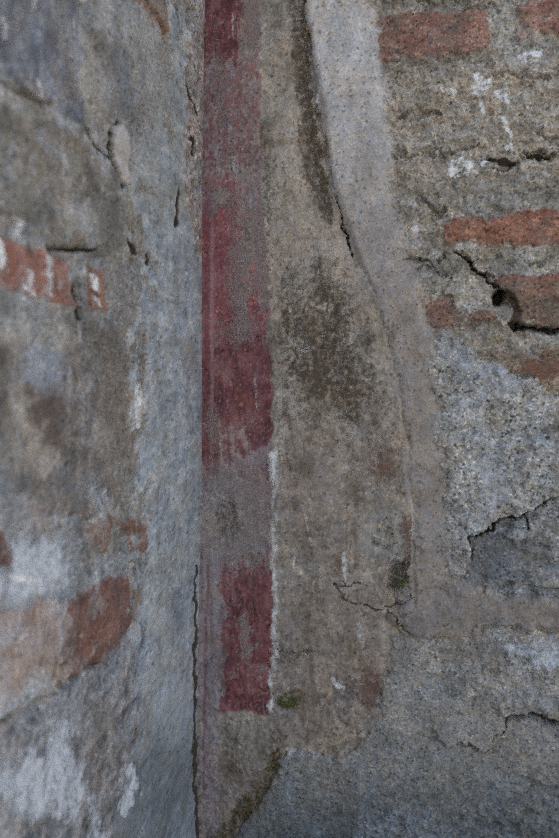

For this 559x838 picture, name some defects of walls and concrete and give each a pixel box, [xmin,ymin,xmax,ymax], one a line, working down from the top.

leakage [288,1,333,224]
crack [337,203,353,256]
crack [454,252,502,293]
crack [510,325,559,335]
spalling [465,496,559,598]
crack [333,581,412,629]